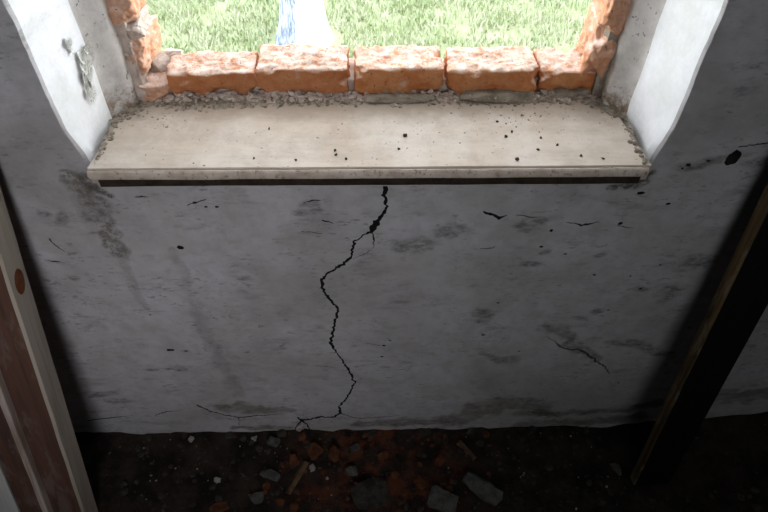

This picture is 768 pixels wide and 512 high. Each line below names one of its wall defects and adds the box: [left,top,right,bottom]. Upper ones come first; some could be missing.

peeling [65,38,96,101]
spalling [724,150,742,165]
crack [295,186,399,430]
crack [547,336,610,374]
crack [197,405,274,427]